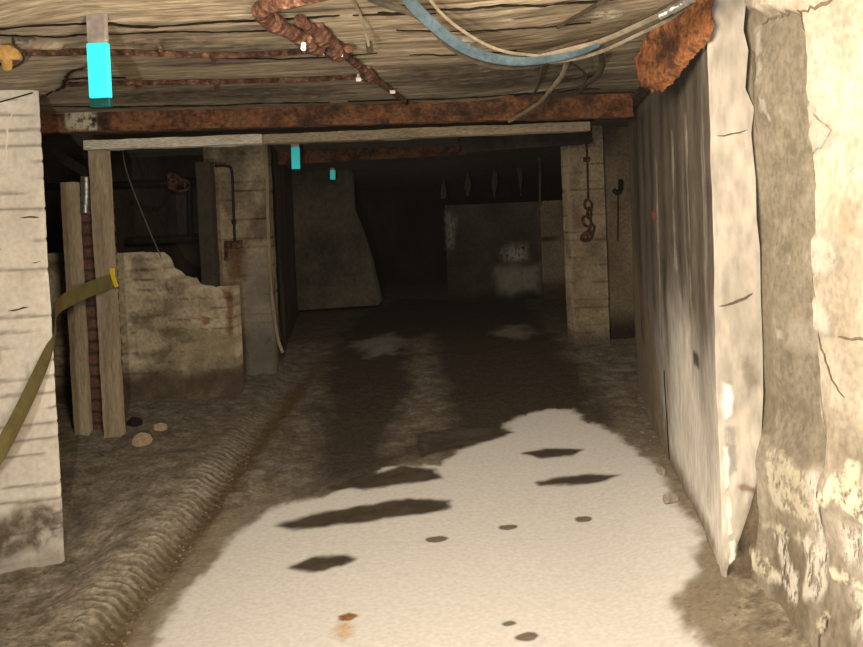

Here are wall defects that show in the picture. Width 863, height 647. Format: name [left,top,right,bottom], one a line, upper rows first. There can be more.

crack [0,23,87,38]
crack [108,19,267,35]
crack [285,0,613,53]
crack [219,54,327,62]
crack [409,51,458,59]
crack [42,65,599,109]
crack [813,114,832,154]
crack [817,330,863,397]
peeling [763,524,812,544]
peeling [749,547,781,584]
peeling [829,567,863,592]